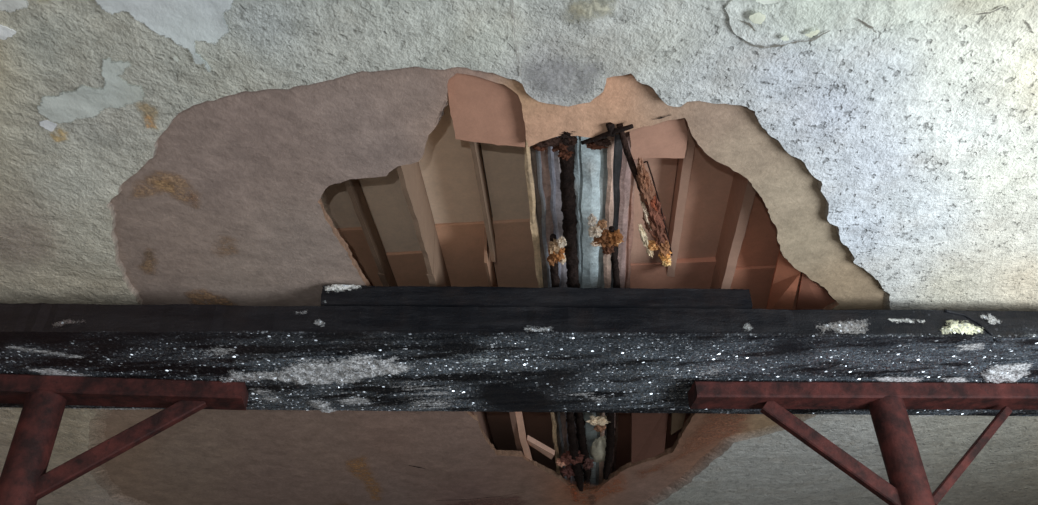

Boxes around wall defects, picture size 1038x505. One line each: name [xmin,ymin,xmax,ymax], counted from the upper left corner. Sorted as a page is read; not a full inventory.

peeling [0,24,17,40]
peeling [0,0,29,13]
peeling [95,0,234,72]
peeling [749,0,779,24]
peeling [37,57,145,132]
corrosion [532,131,611,161]
flaking render [106,66,891,310]
flaking render [88,408,785,505]